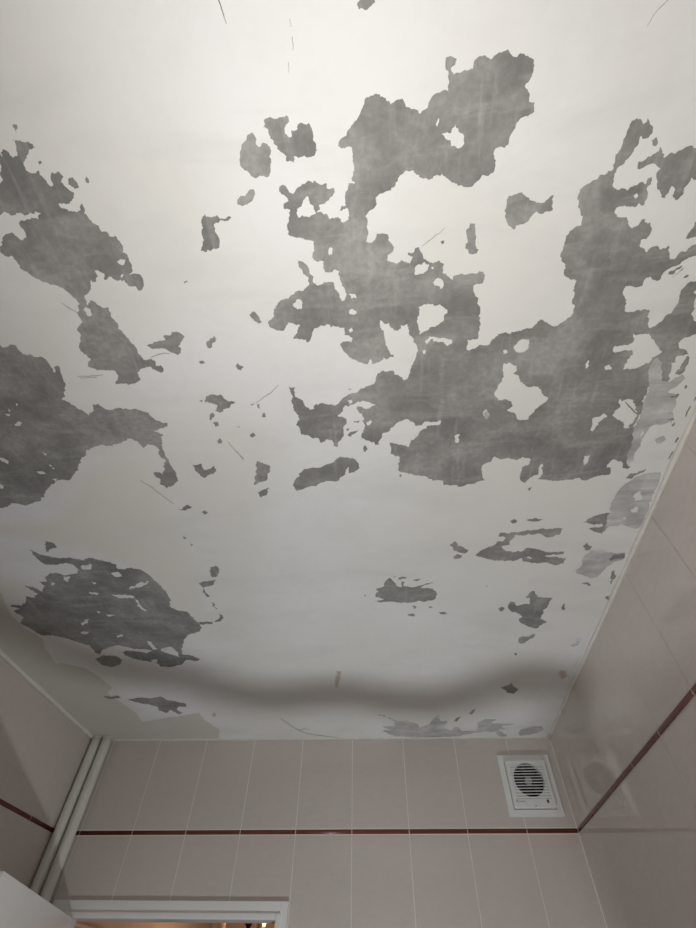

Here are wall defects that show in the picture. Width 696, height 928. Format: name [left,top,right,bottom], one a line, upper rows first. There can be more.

peeling [0,124,184,385]
peeling [201,213,231,252]
peeling [237,49,696,491]
peeling [0,344,178,508]
peeling [450,518,566,565]
peeling [11,541,224,667]
peeling [364,577,447,616]
peeling [498,591,552,656]
peeling [104,696,186,714]